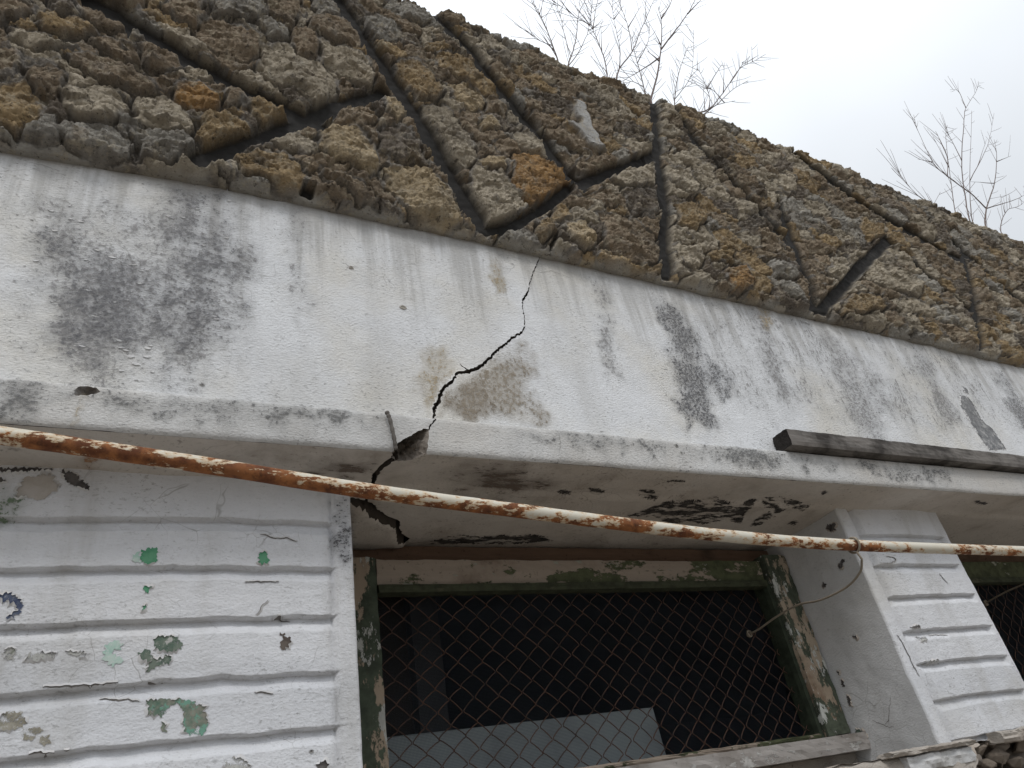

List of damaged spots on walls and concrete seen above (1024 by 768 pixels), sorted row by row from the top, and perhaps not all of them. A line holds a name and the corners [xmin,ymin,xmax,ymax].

water stain [0,185,378,429]
crack [427,260,567,430]
water stain [654,290,1024,439]
water stain [419,344,810,474]
spalling [391,429,429,461]
crack [350,450,404,544]
peeling [628,489,810,526]
peeling [0,589,24,622]
peeling [137,634,183,672]
peeling [280,633,293,651]
peeling [0,711,51,746]
peeling [144,696,210,736]